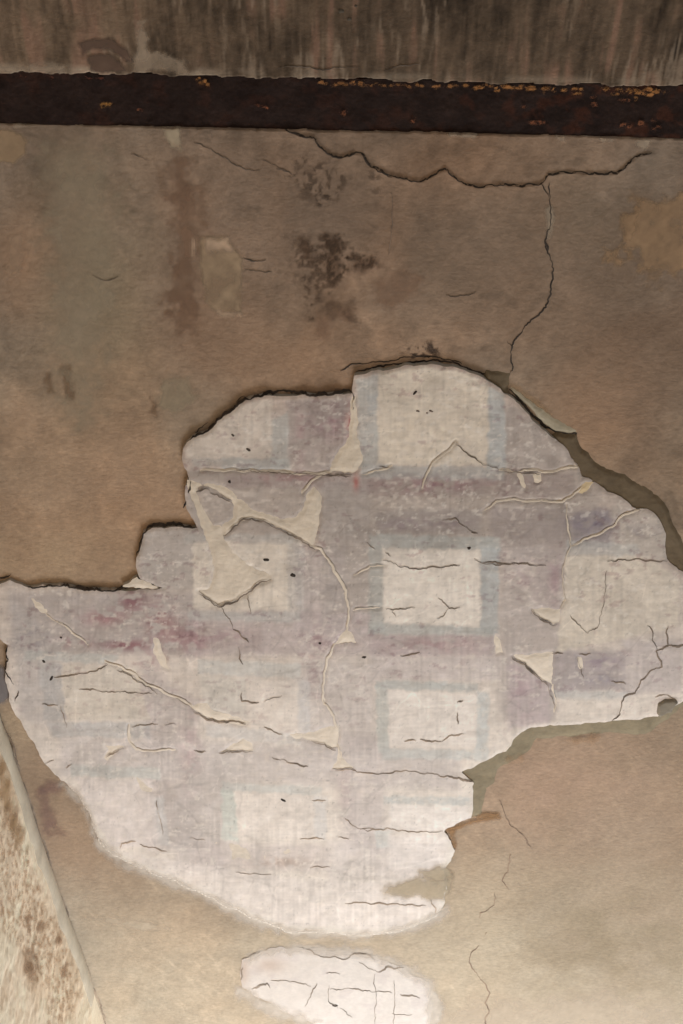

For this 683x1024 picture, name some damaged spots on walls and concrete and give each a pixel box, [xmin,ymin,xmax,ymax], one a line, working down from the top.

rust [318,81,597,107]
rust [603,87,660,102]
crack [285,129,652,434]
spalling [330,398,362,473]
spalling [517,473,541,488]
spalling [187,477,321,604]
spalling [123,574,158,589]
spalling [494,637,553,684]
water stain [0,762,23,843]
spalling [0,812,71,1019]
spalling [385,867,453,900]
crack [469,800,531,1024]